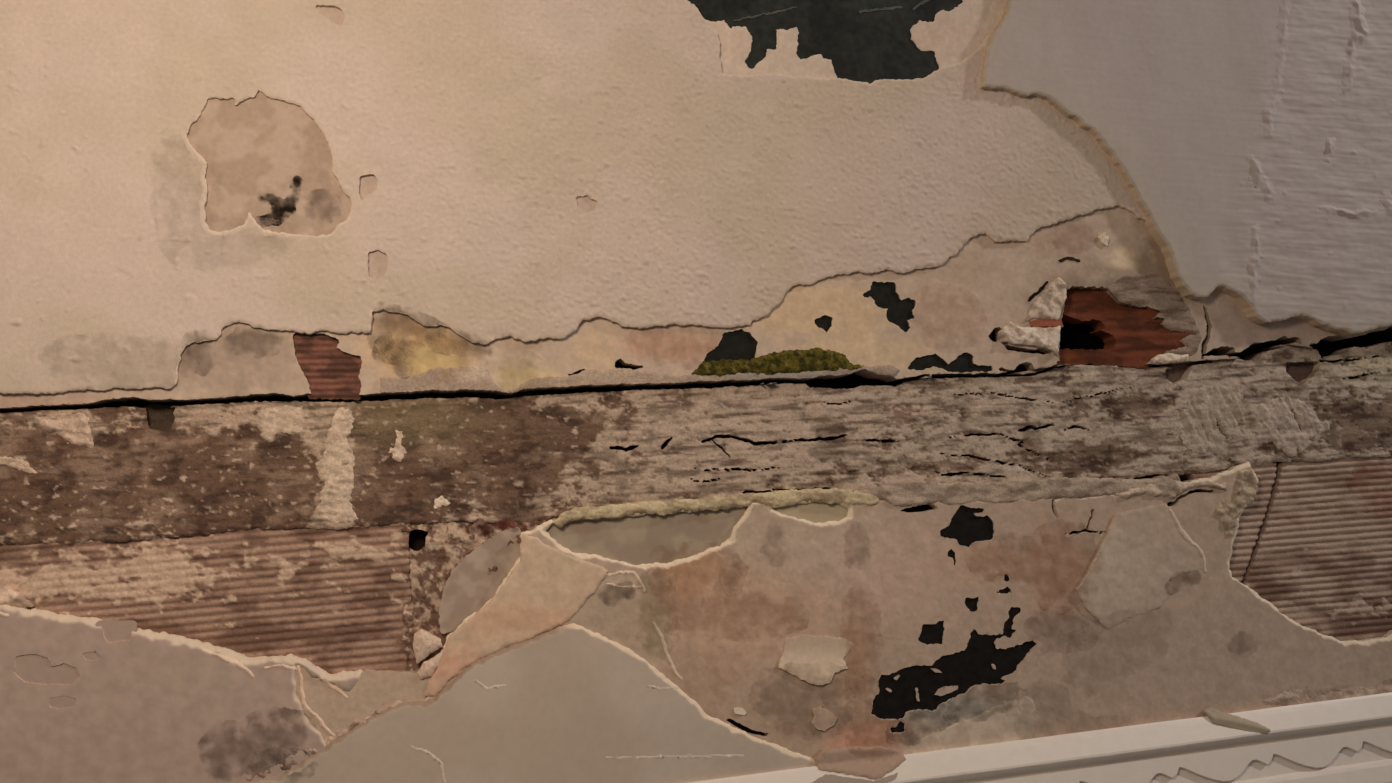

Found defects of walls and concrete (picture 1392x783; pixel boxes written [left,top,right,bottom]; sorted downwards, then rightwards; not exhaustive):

peeling [688,0,1006,84]
spalling [187,91,378,236]
spalling [380,329,994,397]
peeling [815,315,832,332]
peeling [863,282,915,332]
spalling [995,277,1067,356]
crack [0,367,1098,494]
peeling [940,505,994,565]
flaking render [1075,503,1204,629]
flaking render [295,506,747,742]
peeling [778,635,853,685]
peeling [812,574,1036,783]